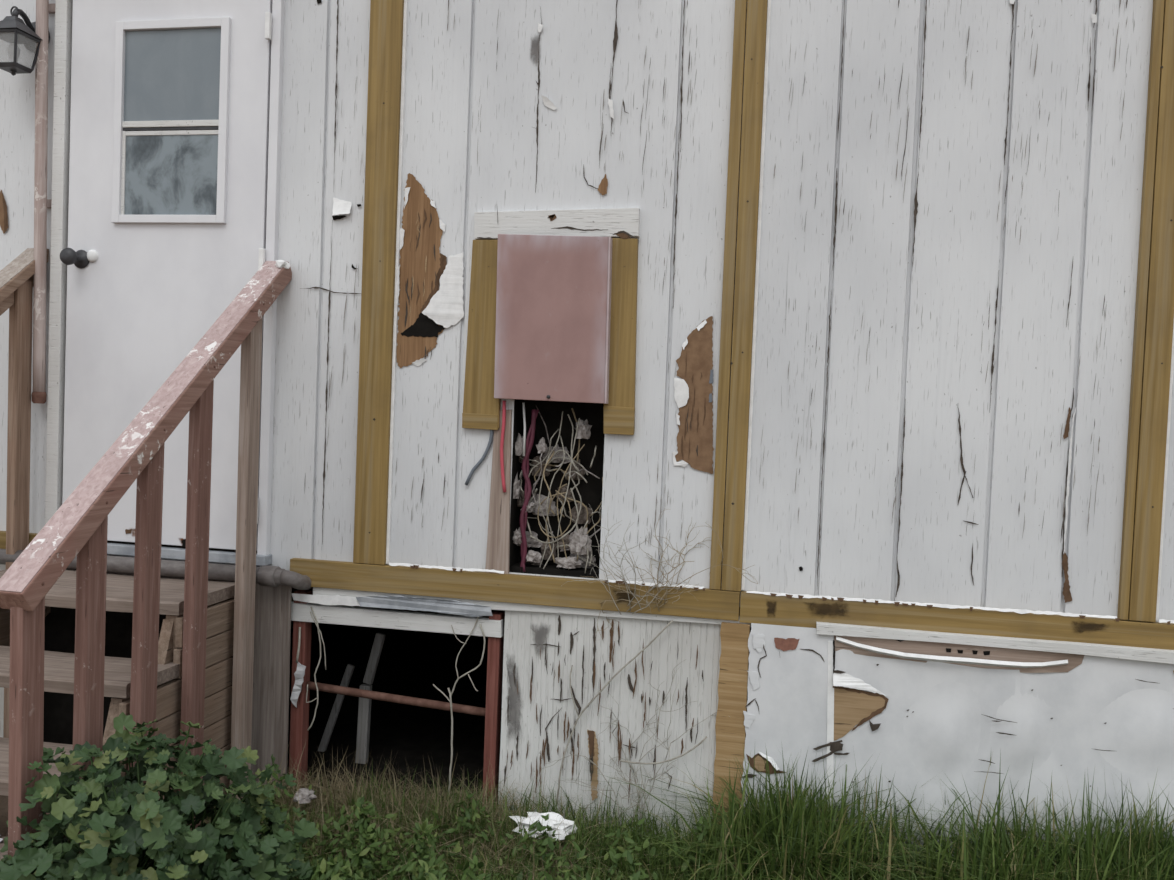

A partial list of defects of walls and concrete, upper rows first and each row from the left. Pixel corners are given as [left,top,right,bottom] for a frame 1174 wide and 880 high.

peeling [0,190,8,233]
peeling [396,173,464,368]
crack [533,0,697,306]
peeling [672,316,714,474]
crack [774,0,929,595]
crack [960,0,973,101]
crack [981,271,999,413]
crack [997,0,1060,239]
crack [958,409,979,585]
peeling [743,634,799,729]
peeling [833,669,888,697]